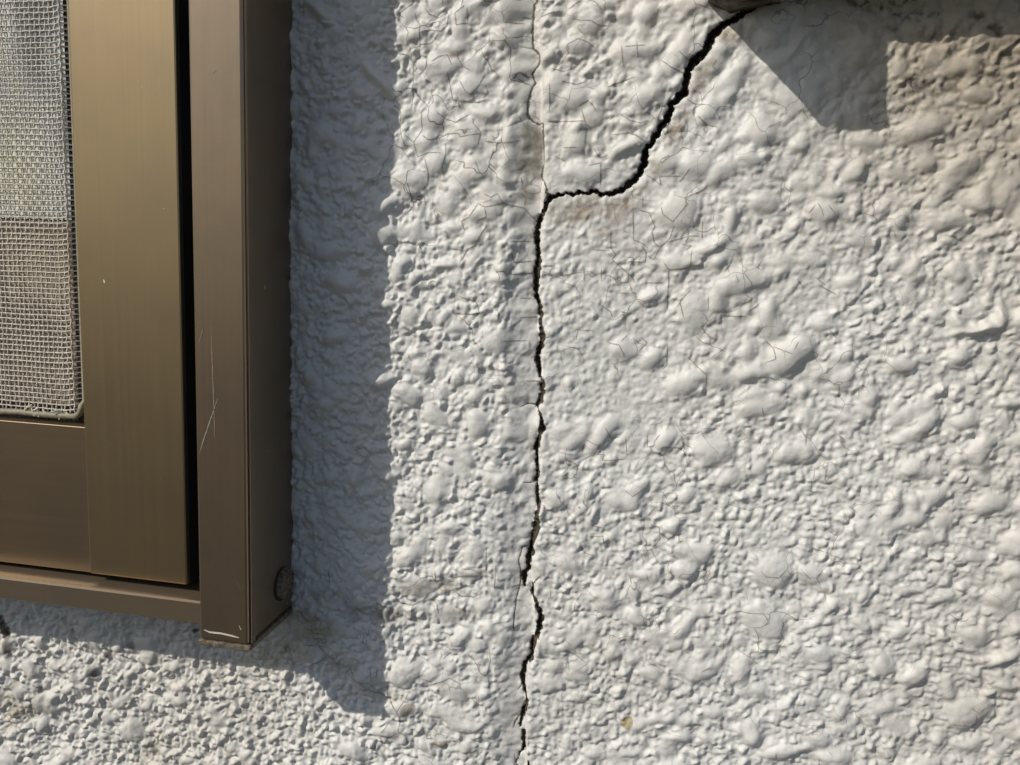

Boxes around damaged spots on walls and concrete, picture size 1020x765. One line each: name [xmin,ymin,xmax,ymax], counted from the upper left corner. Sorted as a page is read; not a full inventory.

crack [387,0,761,765]
crack [765,340,799,363]
crack [731,591,770,626]
crack [294,610,491,743]